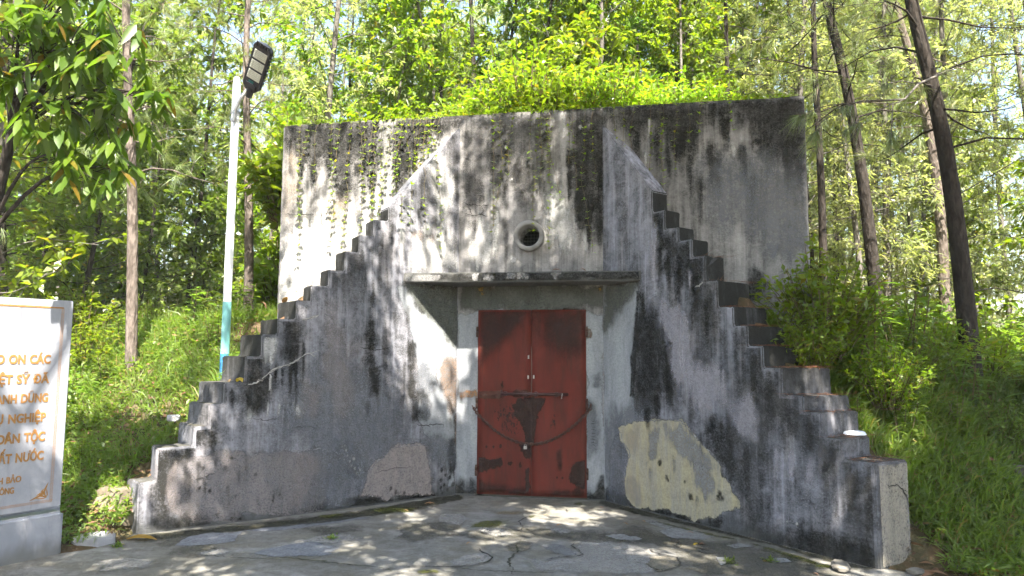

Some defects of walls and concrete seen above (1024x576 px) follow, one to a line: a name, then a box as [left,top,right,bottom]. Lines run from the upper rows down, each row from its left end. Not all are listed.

water stain [382,152,467,271]
water stain [544,159,602,249]
water stain [633,119,808,262]
crack [248,350,319,390]
water stain [137,338,462,556]
spalling [360,442,454,501]
rust [478,396,546,492]
rust [556,460,585,489]
water stain [394,229,839,576]
spalling [618,418,740,539]
crack [275,502,570,575]
spalling [717,543,752,565]